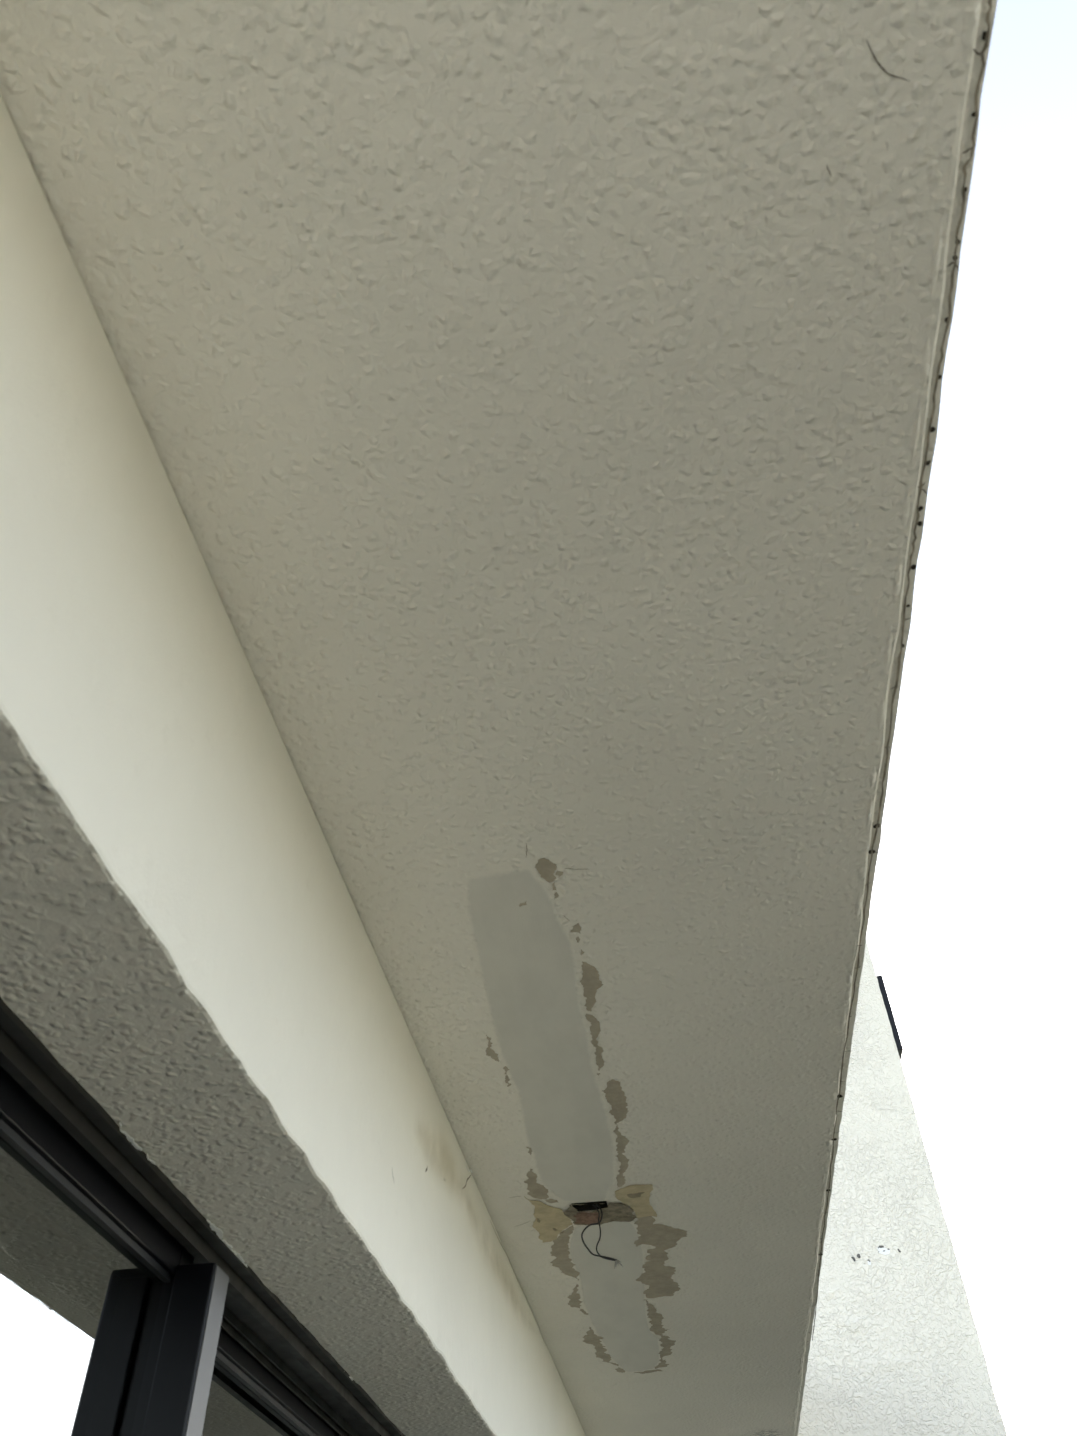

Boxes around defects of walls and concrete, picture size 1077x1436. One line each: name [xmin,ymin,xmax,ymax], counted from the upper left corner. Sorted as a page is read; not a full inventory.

peeling [459,858,687,1374]